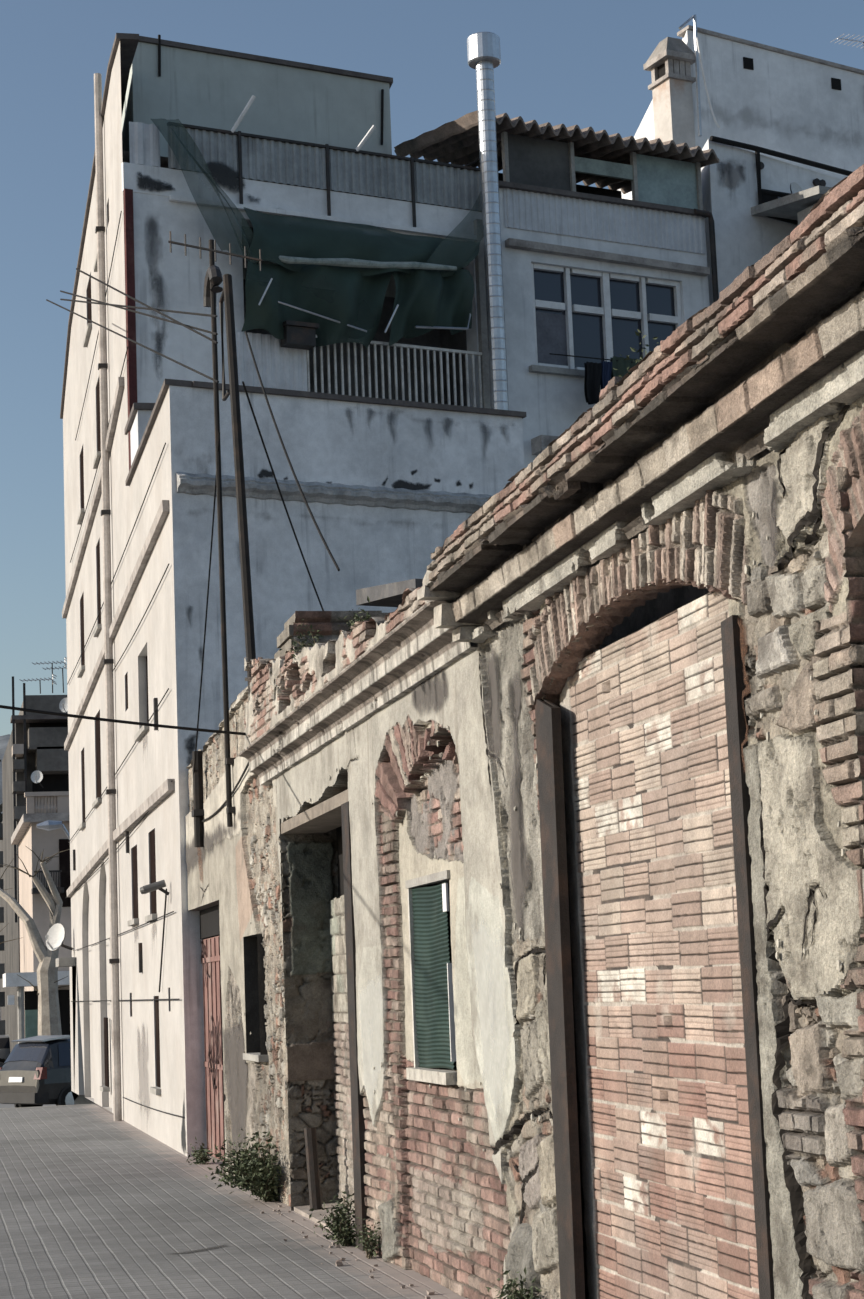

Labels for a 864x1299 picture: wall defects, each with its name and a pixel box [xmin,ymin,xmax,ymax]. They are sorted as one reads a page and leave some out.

peeling [382,470,440,490]
spalling [739,461,864,870]
crack [771,405,850,574]
spalling [224,767,348,1207]
spalling [360,609,560,1299]